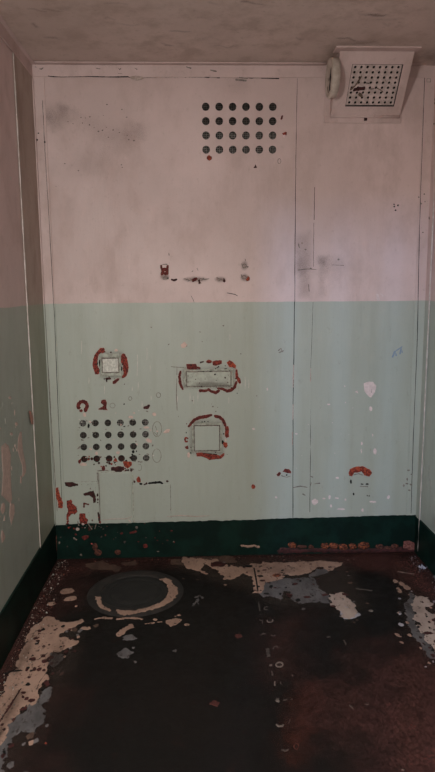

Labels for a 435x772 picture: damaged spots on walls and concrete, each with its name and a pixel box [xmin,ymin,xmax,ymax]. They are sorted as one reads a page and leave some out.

peeling [0,410,26,543]
peeling [0,541,415,772]
peeling [393,571,435,668]